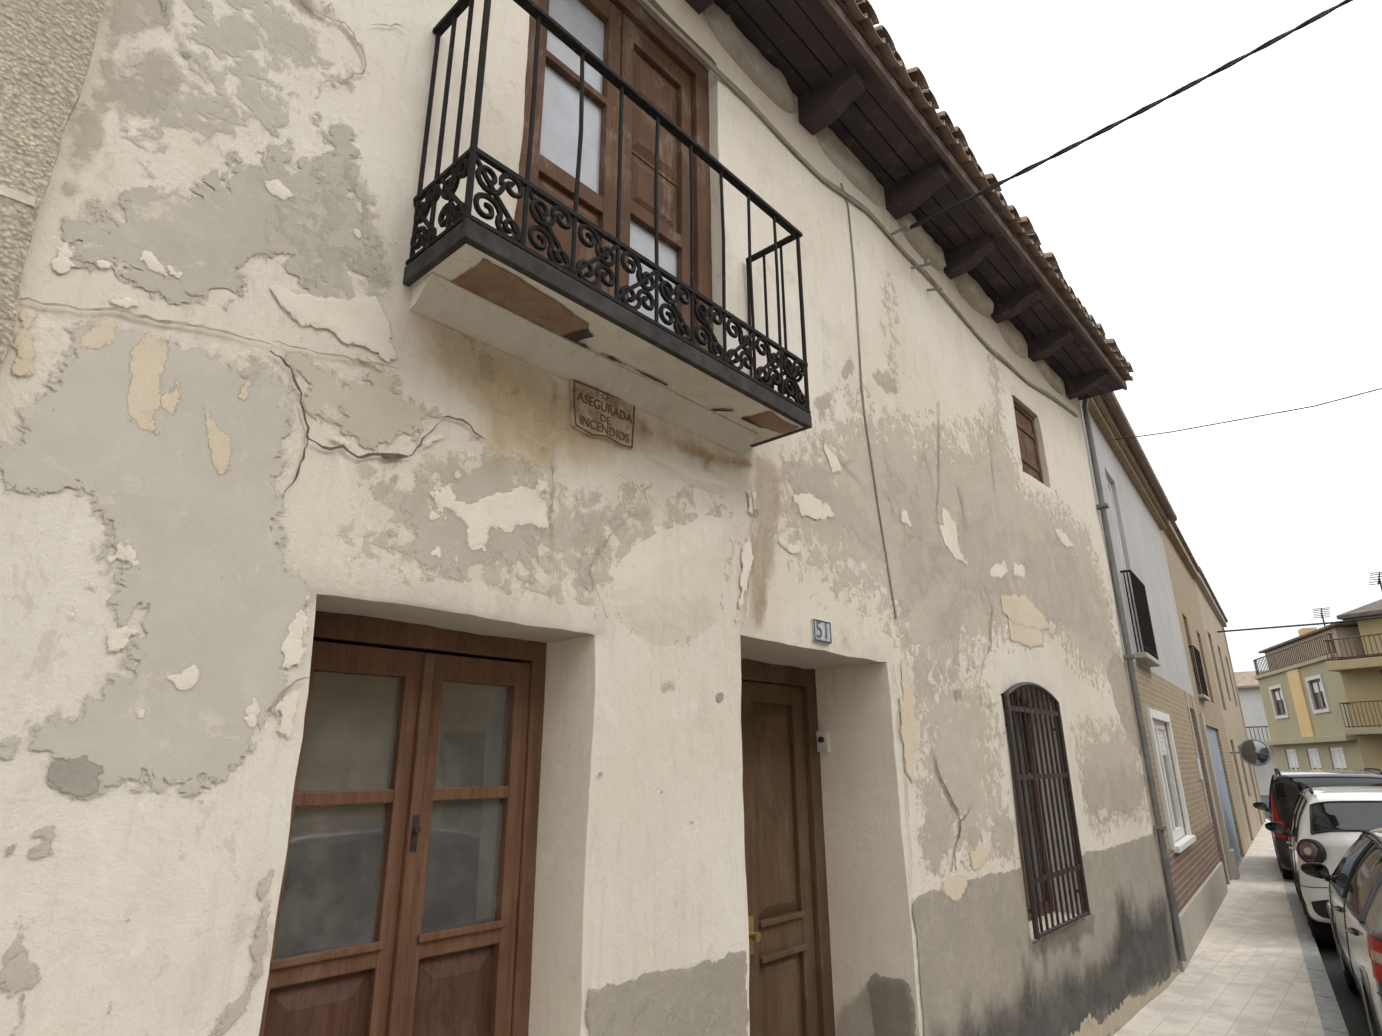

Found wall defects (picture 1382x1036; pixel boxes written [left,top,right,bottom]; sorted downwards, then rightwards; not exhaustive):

peeling [0,111,397,803]
crack [19,297,485,498]
peeling [370,447,550,594]
spalling [741,411,798,434]
peeling [778,439,1118,654]
peeling [5,825,56,860]
crack [893,667,972,879]
peeling [920,789,968,901]
peeling [0,922,40,1036]
peeling [209,868,274,1036]
water stain [969,901,1174,1036]